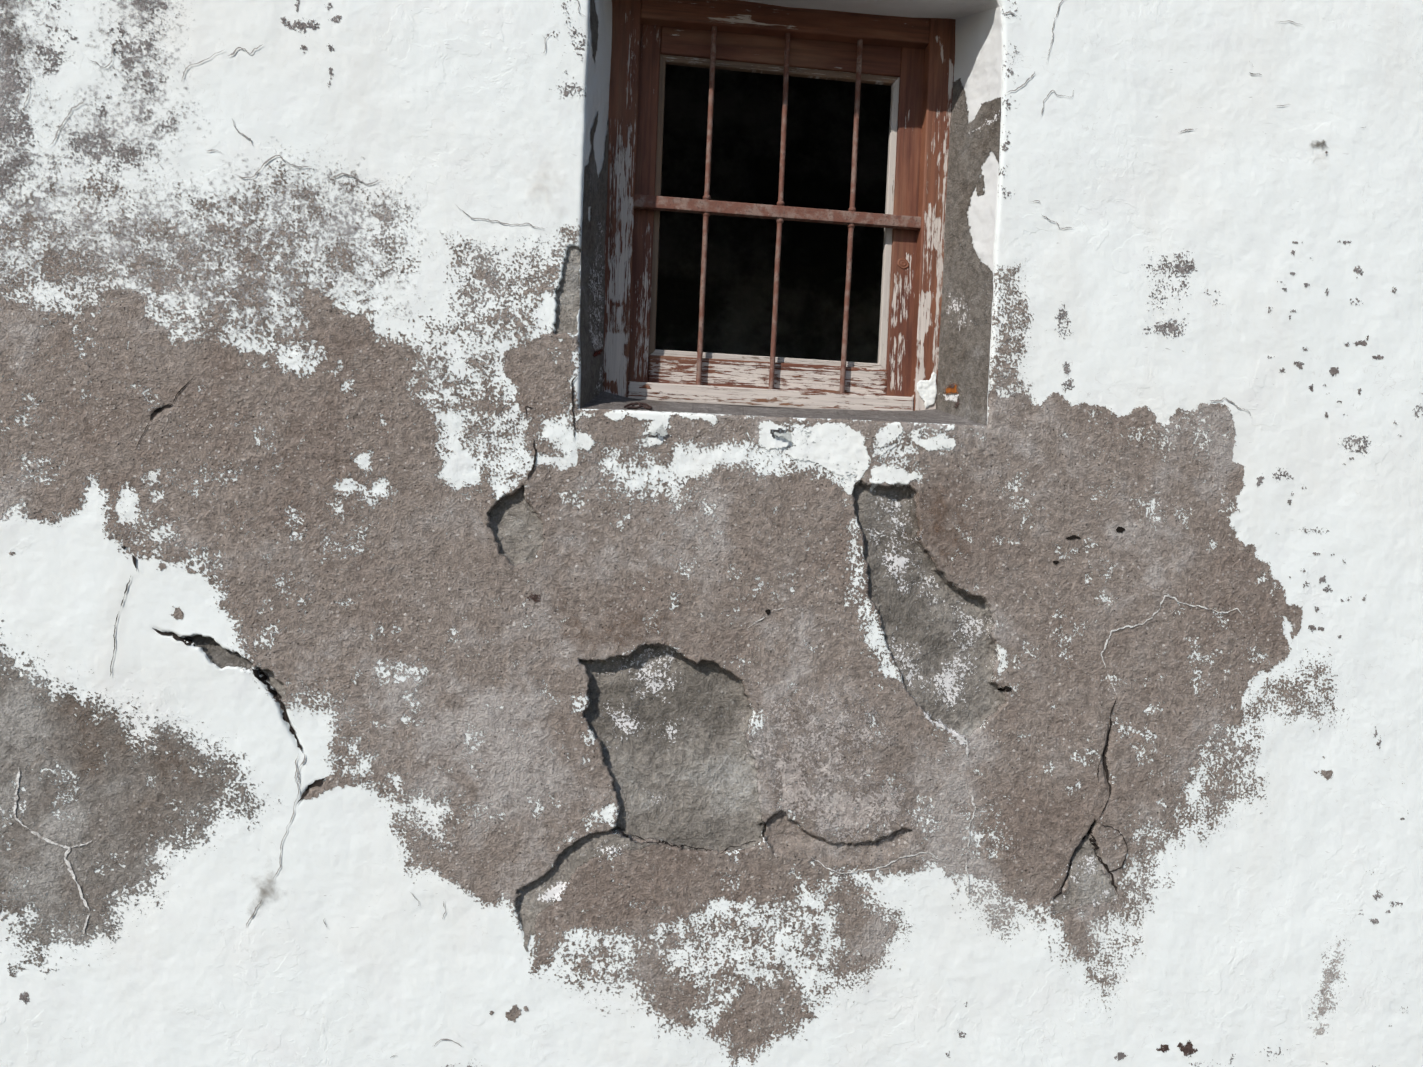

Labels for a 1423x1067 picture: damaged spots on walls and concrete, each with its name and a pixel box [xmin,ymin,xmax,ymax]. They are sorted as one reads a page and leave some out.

peeling [0,0,78,199]
peeling [103,0,187,139]
peeling [281,0,341,53]
peeling [547,0,599,61]
peeling [1144,251,1220,337]
crack [136,380,191,447]
crack [152,628,195,646]
crack [1053,593,1241,901]
peeling [0,613,281,977]
crack [246,669,326,928]
peeling [489,1005,529,1023]
peeling [1156,1040,1235,1067]